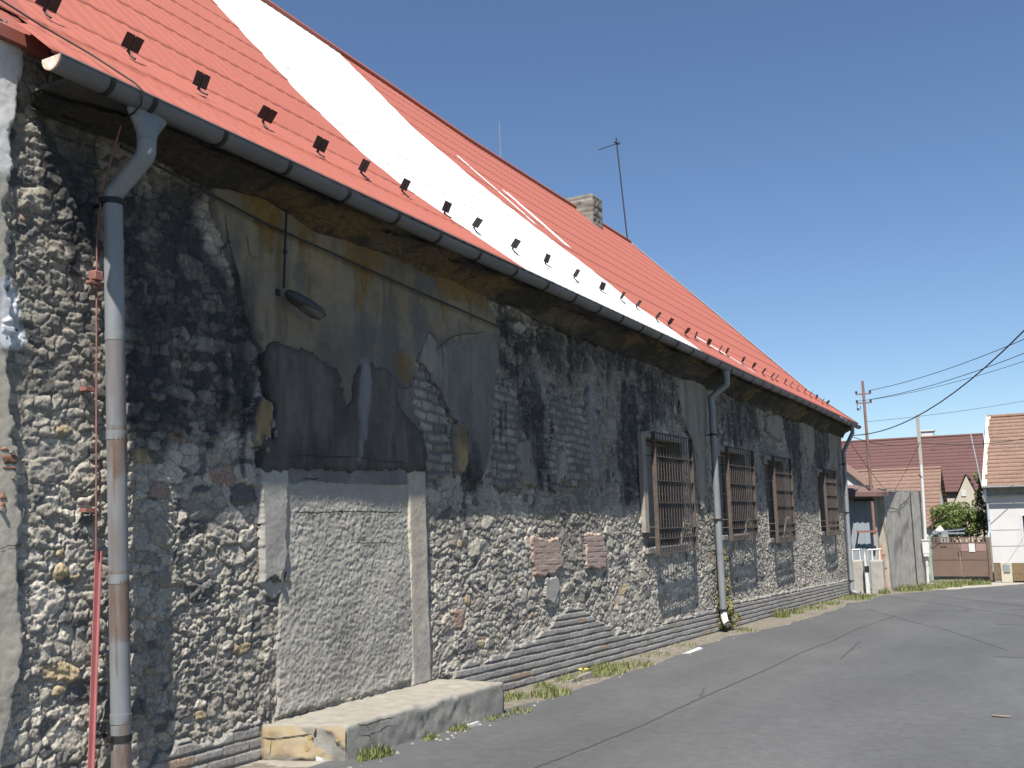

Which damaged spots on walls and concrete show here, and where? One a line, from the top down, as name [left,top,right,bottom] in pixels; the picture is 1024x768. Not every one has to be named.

peeling [0,277,29,349]
water stain [123,183,261,475]
peeling [247,396,278,453]
crack [397,332,483,417]
spalling [412,361,470,486]
water stain [499,306,675,502]
water stain [714,393,759,449]
water stain [783,417,801,497]